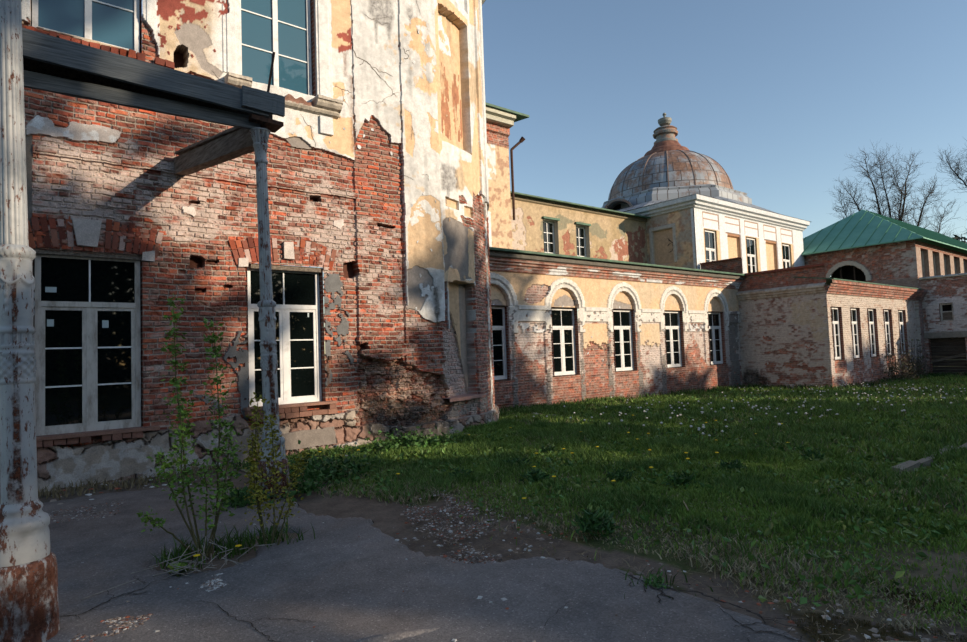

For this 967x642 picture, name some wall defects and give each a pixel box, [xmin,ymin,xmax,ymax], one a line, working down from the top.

peeling [22,0,230,69]
crack [335,46,409,104]
flaking render [286,0,505,414]
flaking render [524,283,578,307]
spalling [354,342,458,438]
peeling [515,335,548,407]
peeling [583,336,614,399]
corrosion [7,354,23,502]